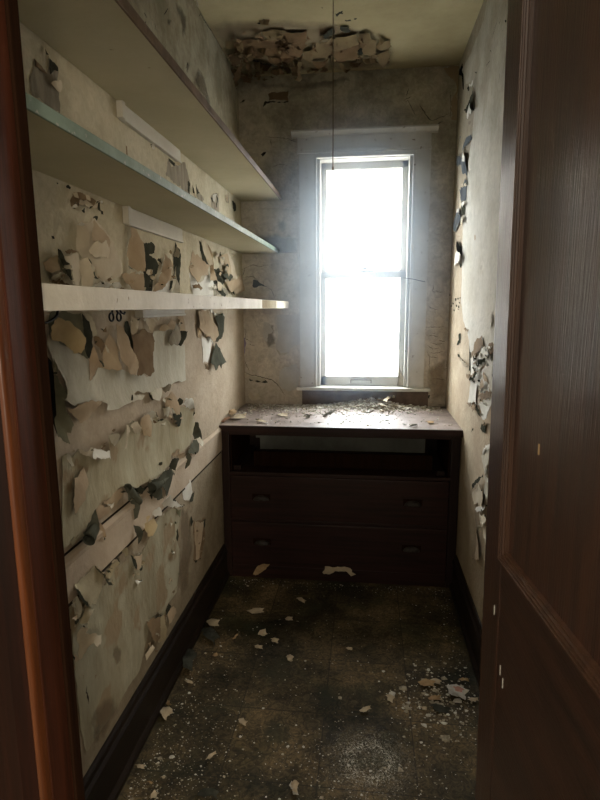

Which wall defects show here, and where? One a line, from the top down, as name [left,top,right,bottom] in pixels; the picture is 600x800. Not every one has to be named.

flaking render [30,49,62,113]
peeling [225,11,392,90]
peeling [57,183,103,220]
peeling [449,0,508,433]
peeling [43,227,266,297]
peeling [221,409,247,423]
peeling [47,309,227,752]
peeling [471,444,490,562]